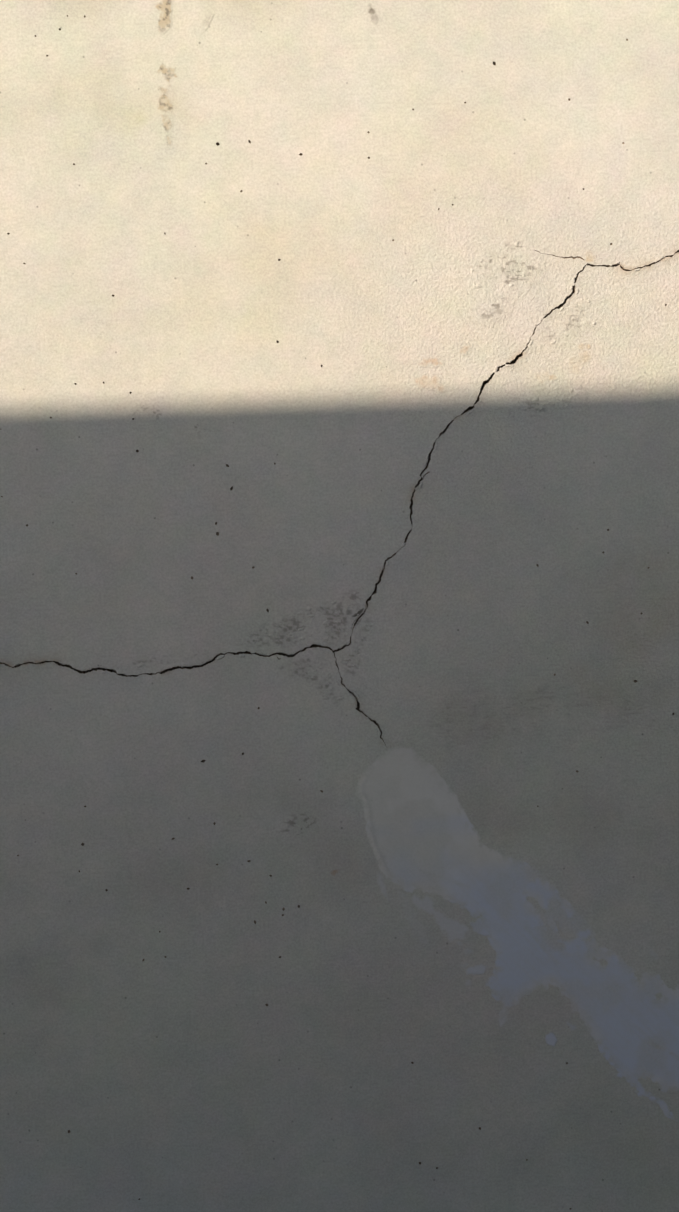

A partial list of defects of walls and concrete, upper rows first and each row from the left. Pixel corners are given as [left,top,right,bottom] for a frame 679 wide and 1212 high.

crack [0,250,679,745]